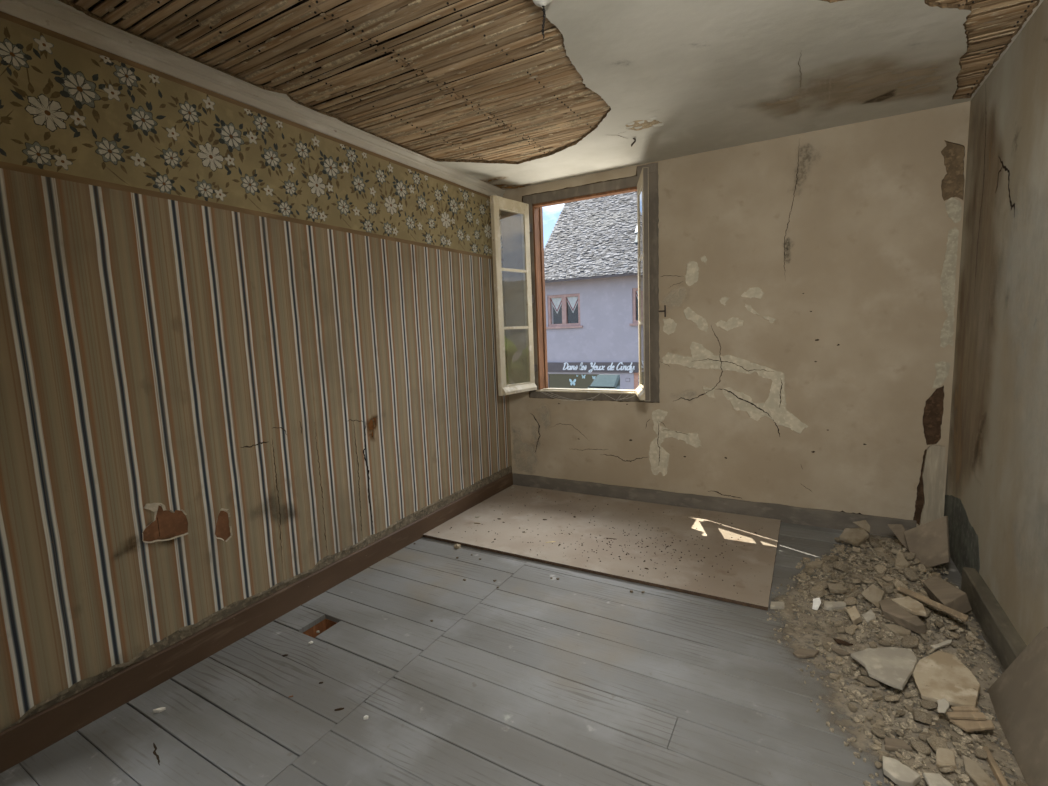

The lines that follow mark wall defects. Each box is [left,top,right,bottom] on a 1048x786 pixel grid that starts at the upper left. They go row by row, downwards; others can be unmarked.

peeling [685,255,707,286]
peeling [663,287,777,335]
crack [784,151,799,274]
spalling [940,141,964,348]
damp [951,116,1001,493]
crack [974,130,1015,293]
crack [532,414,688,462]
peeling [648,409,703,476]
crack [666,326,783,436]
peeling [661,342,808,435]
spalling [913,386,944,525]
peeling [0,466,511,732]